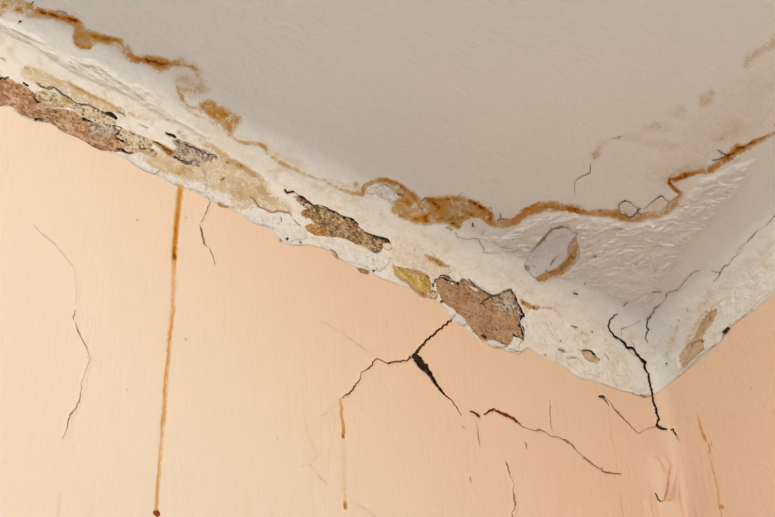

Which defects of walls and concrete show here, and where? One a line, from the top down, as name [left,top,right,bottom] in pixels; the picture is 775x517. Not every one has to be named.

leakage [23,66,132,115]
leakage [0,0,198,72]
leakage [147,141,290,210]
spalling [0,19,647,392]
leakage [176,85,775,230]
peeling [481,158,758,307]
crack [599,194,684,218]
crack [31,223,99,441]
corrosion [153,184,183,517]
crack [302,318,622,484]
crack [597,214,775,440]
peeling [665,256,775,379]